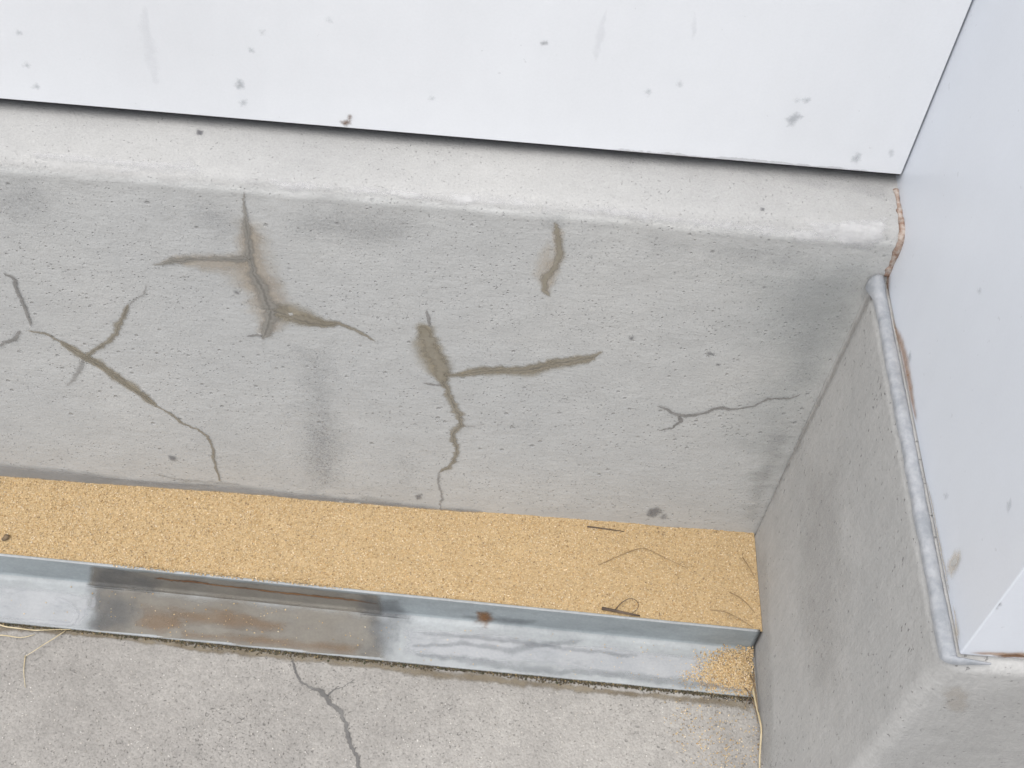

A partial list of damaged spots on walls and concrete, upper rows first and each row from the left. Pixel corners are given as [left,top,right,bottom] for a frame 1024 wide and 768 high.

crack [154,194,374,341]
crack [541,224,563,296]
crack [0,273,220,481]
crack [417,311,602,472]
crack [658,394,800,431]
crack [291,661,361,768]